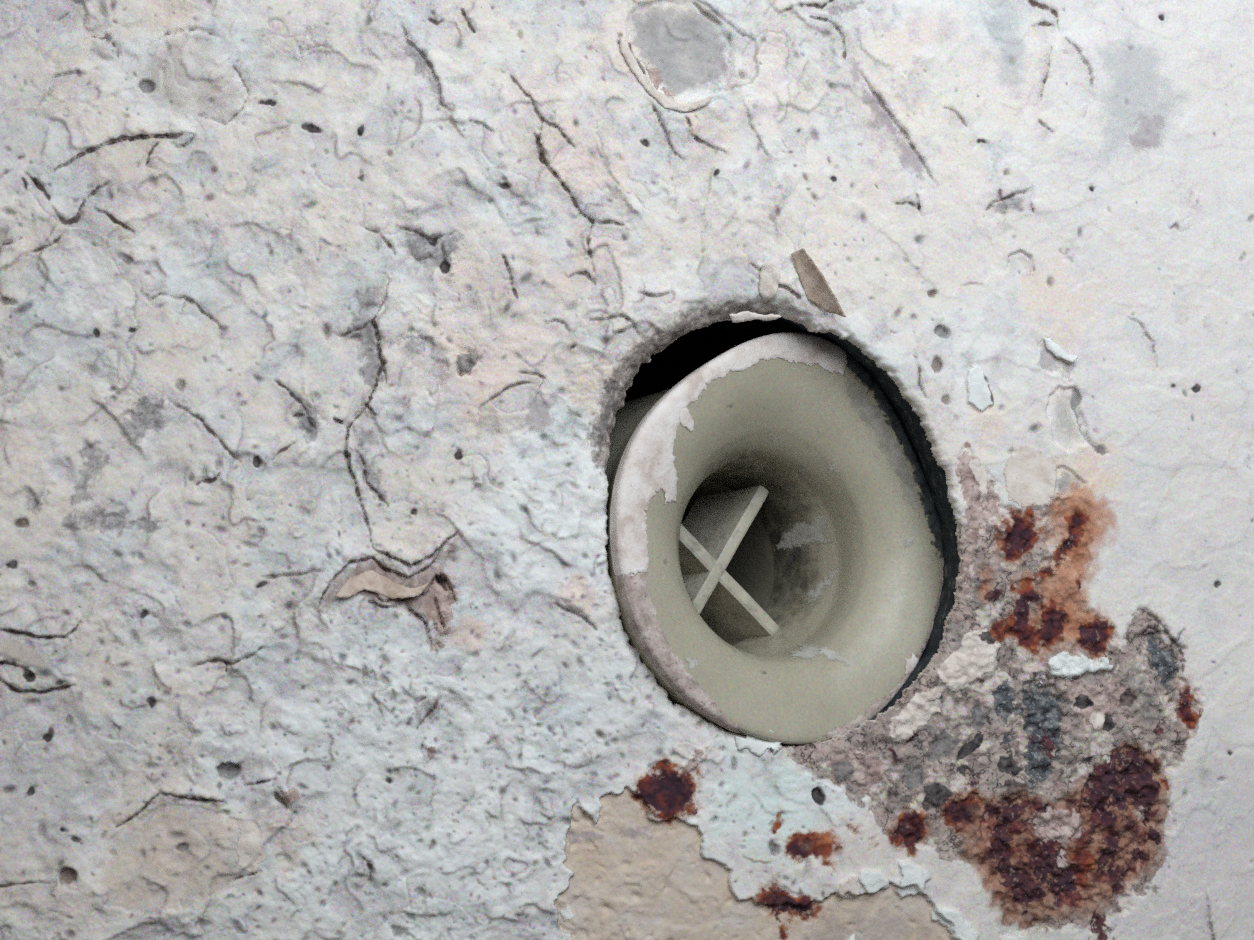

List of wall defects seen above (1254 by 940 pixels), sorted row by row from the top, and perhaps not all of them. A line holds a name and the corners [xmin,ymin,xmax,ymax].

spalling [620,8,727,112]
crack [4,132,194,251]
crack [511,76,619,284]
crack [277,283,389,522]
crack [1,624,78,693]
peeling [334,570,429,599]
spalling [735,441,1203,895]
corrosion [991,488,1114,658]
corrosion [632,746,708,823]
peeling [554,787,978,940]
corrosion [772,813,842,865]
corrosion [942,742,1168,940]